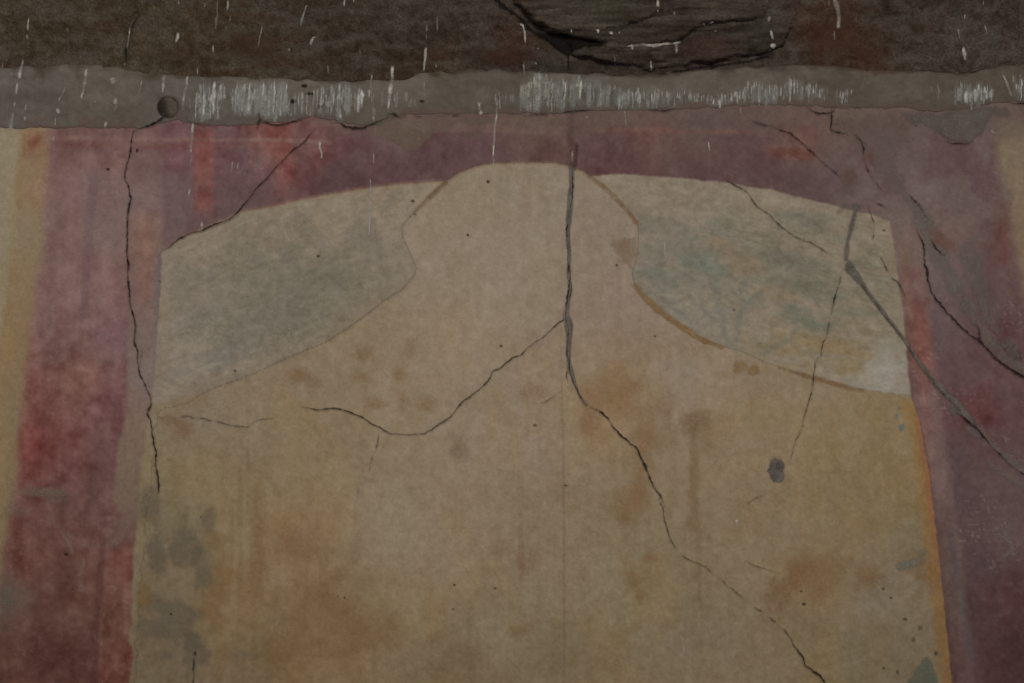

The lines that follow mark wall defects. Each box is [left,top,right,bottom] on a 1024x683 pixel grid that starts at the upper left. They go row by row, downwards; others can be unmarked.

damp [183,77,374,120]
damp [520,74,760,110]
damp [958,83,992,110]
crack [813,111,869,171]
crack [168,118,309,248]
crack [543,166,668,531]
crack [810,204,1001,455]
crack [919,235,1024,378]
crack [310,408,386,447]
crack [423,352,524,434]
crack [756,608,826,683]